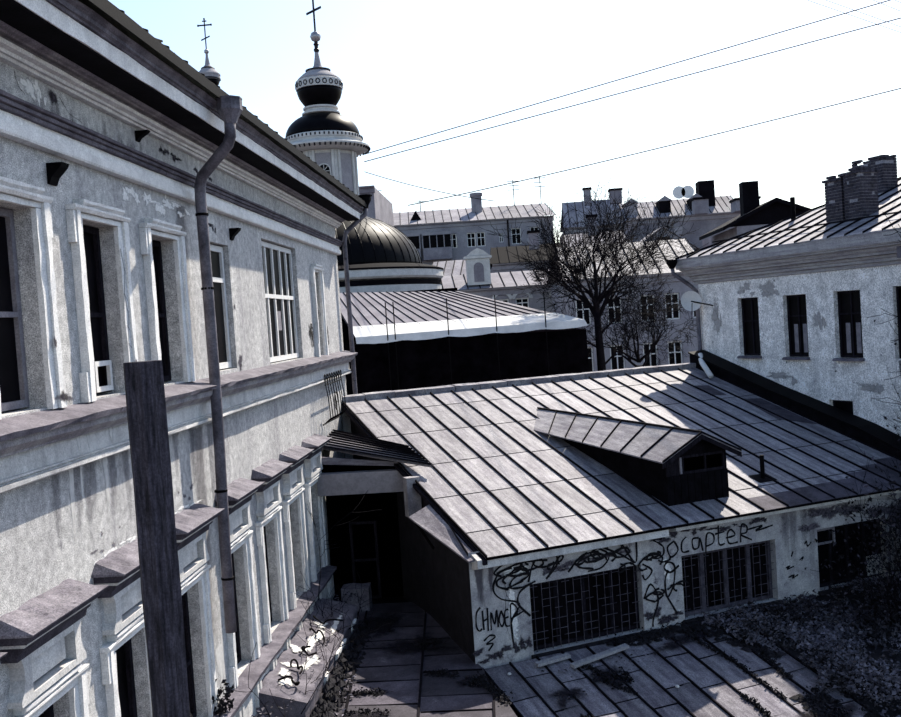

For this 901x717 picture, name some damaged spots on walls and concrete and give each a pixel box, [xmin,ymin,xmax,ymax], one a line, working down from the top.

flaking render [20,78,57,106]
flaking render [122,186,191,218]